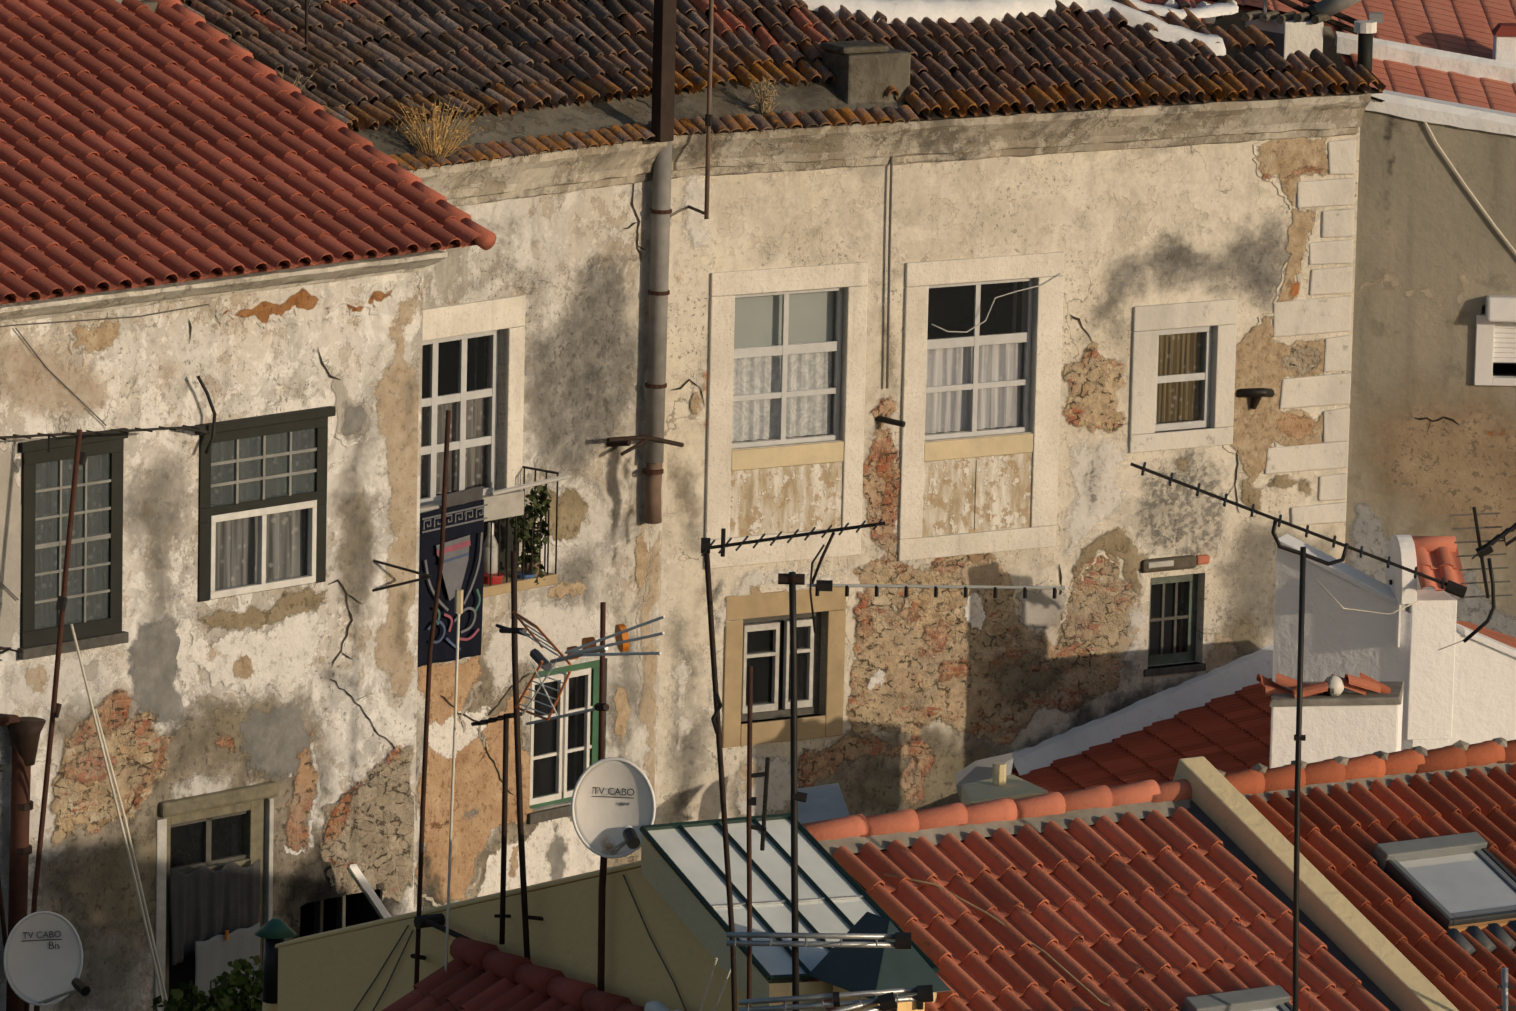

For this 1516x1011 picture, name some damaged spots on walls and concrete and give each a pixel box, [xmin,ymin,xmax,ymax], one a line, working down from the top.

leakage [1107,223,1289,312]
spalling [1222,137,1330,510]
flaking render [5,653,173,847]
crack [328,580,395,749]
spalling [198,281,600,907]
flaking render [737,342,1224,816]